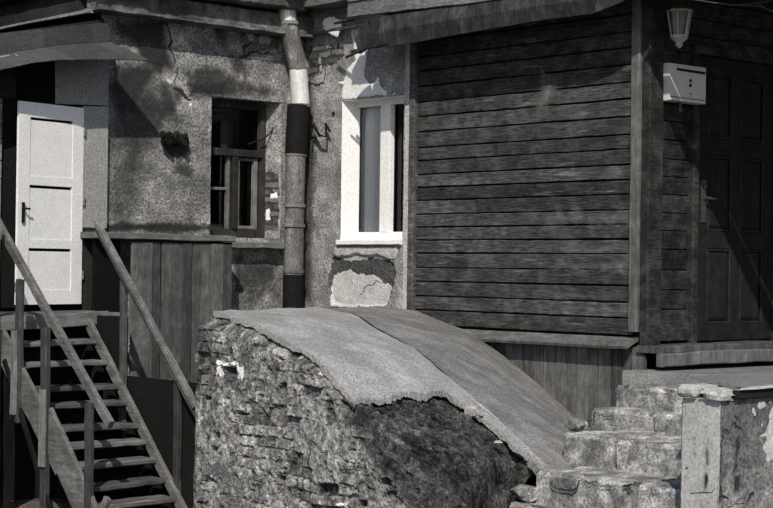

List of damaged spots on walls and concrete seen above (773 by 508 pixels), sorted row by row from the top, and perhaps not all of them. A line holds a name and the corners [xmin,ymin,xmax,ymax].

crack [159,0,221,101]
water stain [187,56,268,96]
flaking render [304,41,344,86]
peeling [338,29,398,99]
water stain [113,21,180,208]
water stain [163,144,192,176]
flaking render [328,246,398,308]
crack [690,412,742,507]
peeling [752,400,773,462]